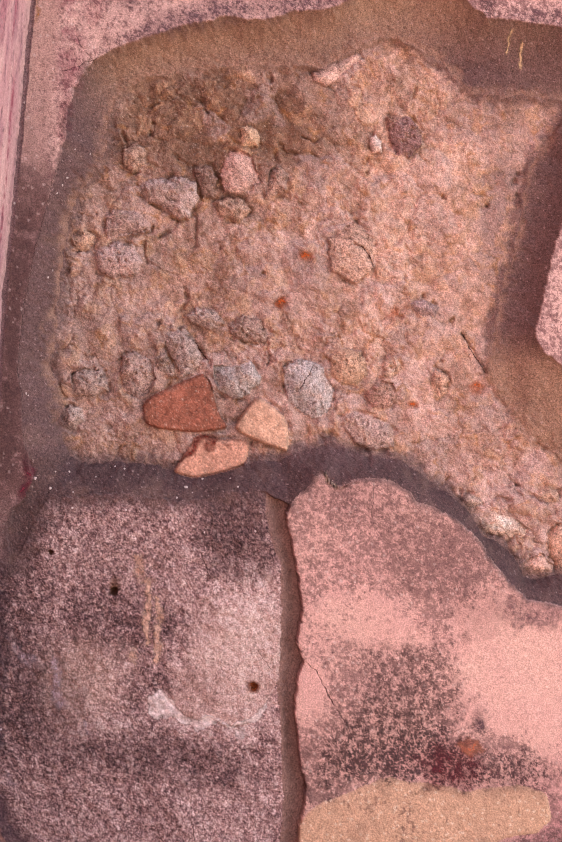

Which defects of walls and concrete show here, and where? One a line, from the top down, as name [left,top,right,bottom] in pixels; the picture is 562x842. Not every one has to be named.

spalling [7,0,562,606]